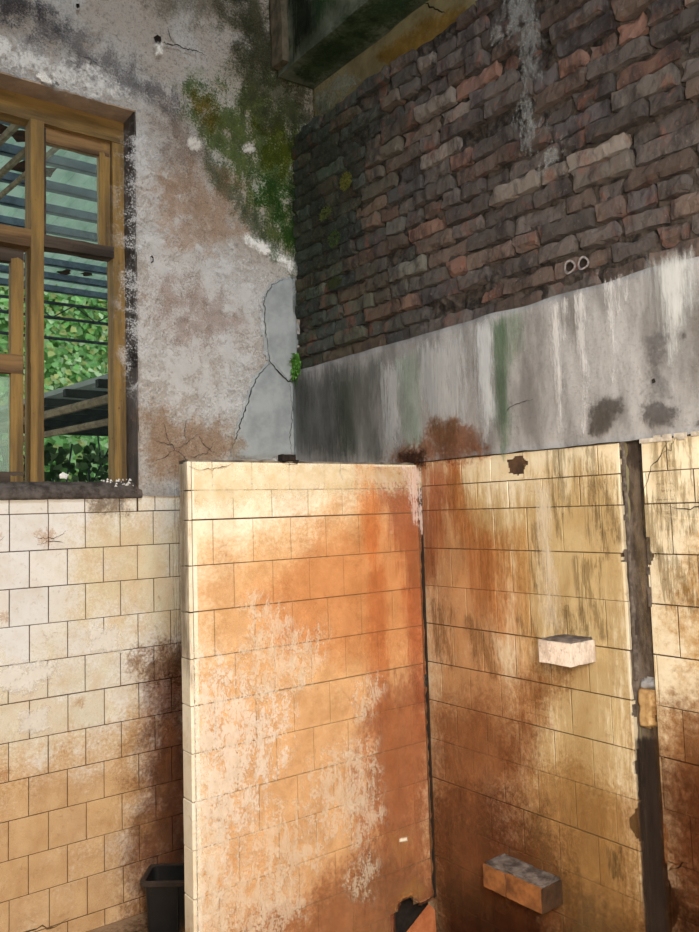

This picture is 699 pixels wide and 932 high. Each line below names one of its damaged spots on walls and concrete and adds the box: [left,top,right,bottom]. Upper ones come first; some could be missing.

leakage [0,35,132,97]
leakage [182,0,311,274]
crack [156,280,295,471]
leakage [380,358,406,444]
leakage [417,329,466,433]
leakage [477,323,496,435]
leakage [552,293,589,416]
efflorescence [659,256,692,361]
corrosion [399,449,424,466]
spalling [393,895,436,932]
corrosion [431,789,635,932]
corrosion [673,714,699,932]